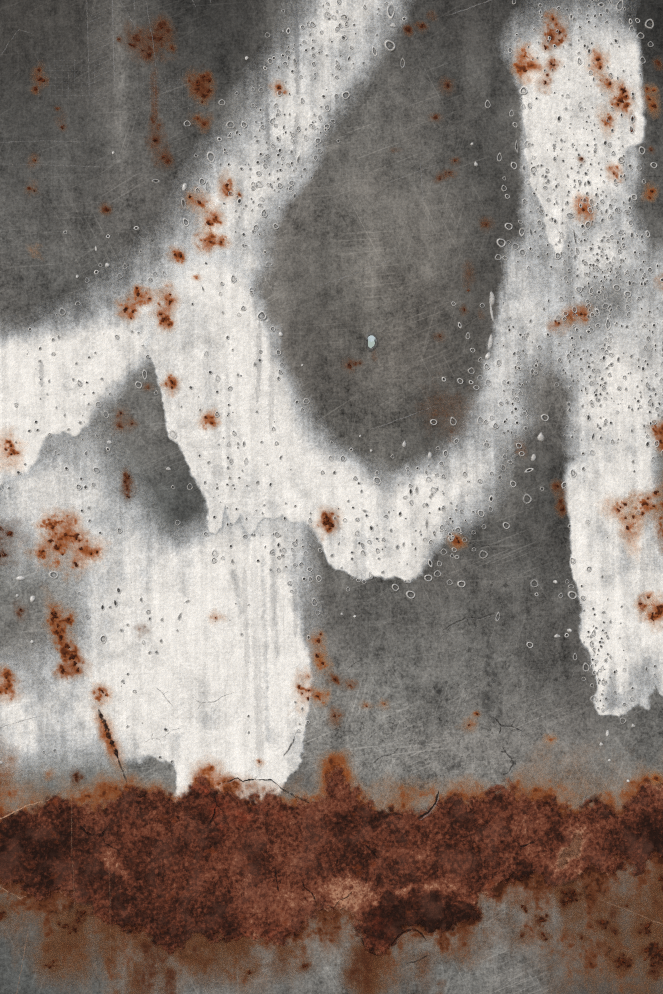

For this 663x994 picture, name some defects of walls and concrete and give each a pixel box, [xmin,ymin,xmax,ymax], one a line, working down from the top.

corrosion [513,14,567,85]
corrosion [591,50,635,132]
corrosion [119,285,177,329]
corrosion [652,423,663,450]
corrosion [35,514,101,568]
corrosion [612,491,663,549]
corrosion [638,593,663,622]
corrosion [47,605,84,679]
corrosion [0,687,663,994]